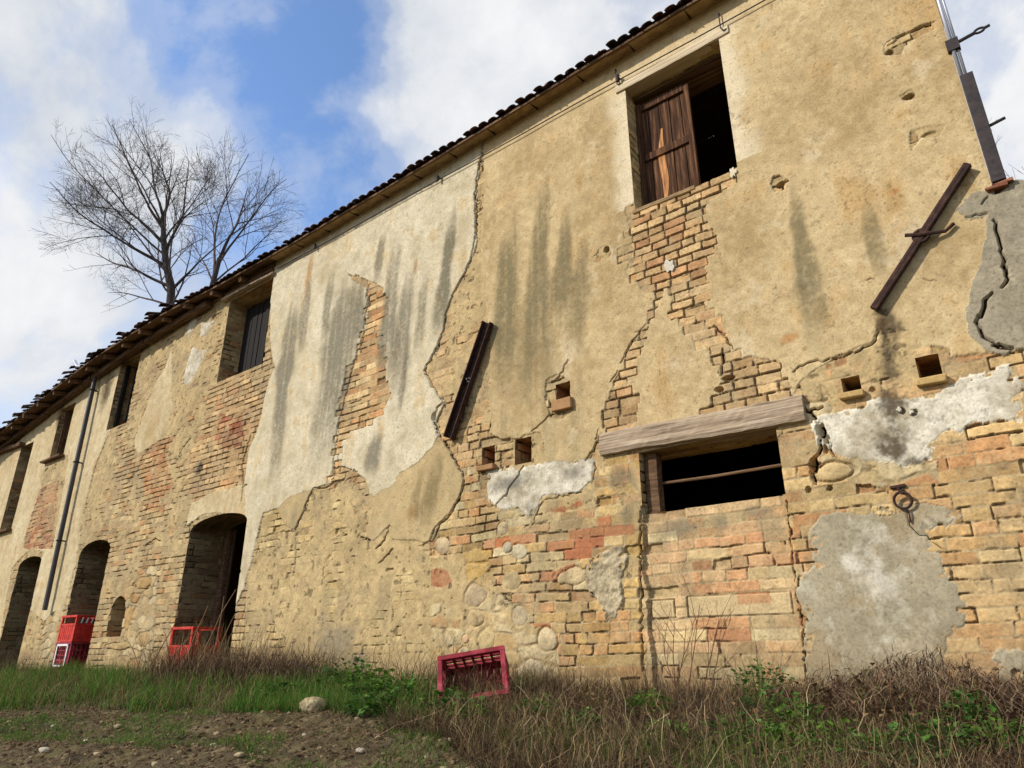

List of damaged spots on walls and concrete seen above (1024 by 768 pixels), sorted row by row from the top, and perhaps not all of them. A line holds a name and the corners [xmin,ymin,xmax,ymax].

leakage [273,317,307,456]
leakage [315,287,364,427]
leakage [366,438,381,469]
leakage [375,243,422,397]
spalling [230,171,600,685]
leakage [434,227,454,322]
crack [422,146,483,546]
leakage [494,209,583,358]
spalling [591,167,1024,694]
leakage [877,309,903,378]
leakage [877,391,921,464]
crack [968,198,1013,350]